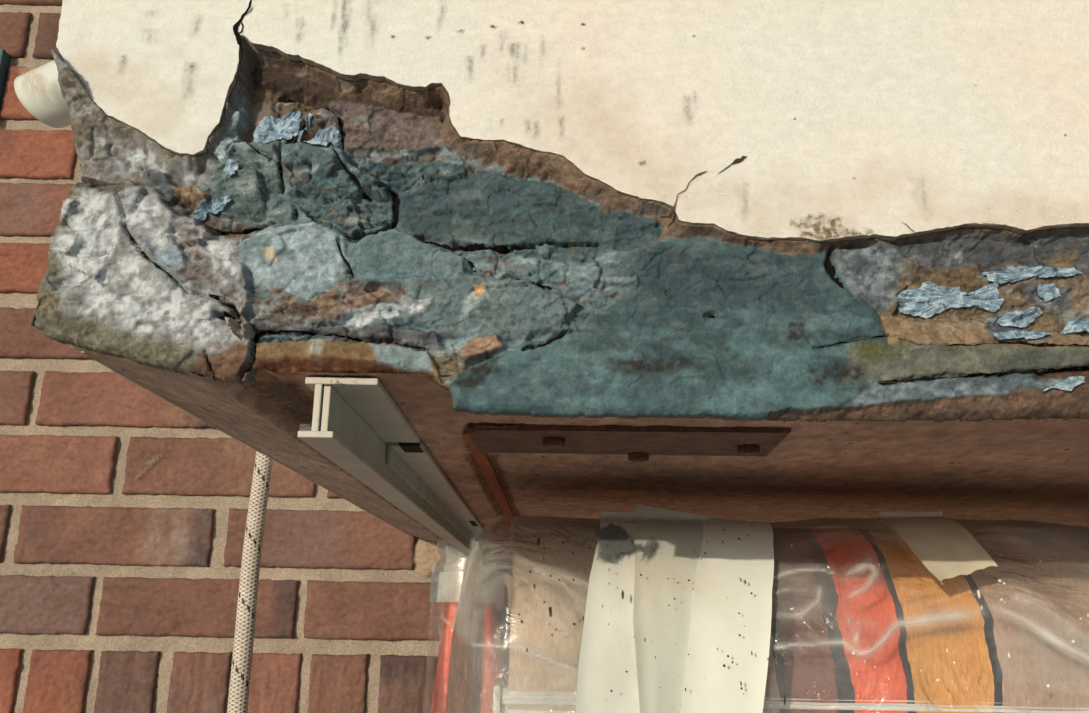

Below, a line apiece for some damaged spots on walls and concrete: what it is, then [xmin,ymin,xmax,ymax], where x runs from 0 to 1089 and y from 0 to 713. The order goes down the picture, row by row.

crack [117,194,429,383]
crack [206,98,400,285]
crack [422,241,536,272]
crack [522,331,572,351]
spalling [33,37,1089,423]
crack [660,156,747,218]